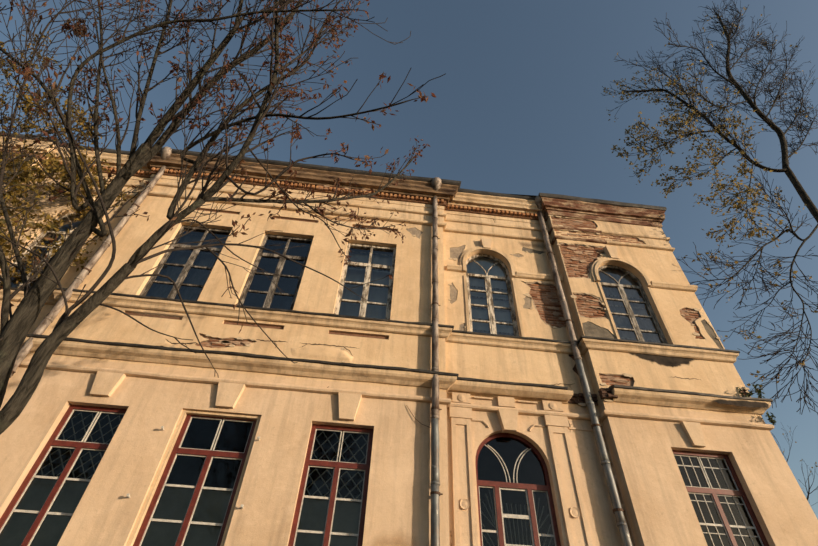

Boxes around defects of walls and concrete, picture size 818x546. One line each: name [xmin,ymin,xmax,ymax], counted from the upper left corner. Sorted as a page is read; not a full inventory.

flaking render [449,245,466,261]
flaking render [510,247,547,257]
flaking render [548,215,646,279]
flaking render [448,283,458,304]
flaking render [521,281,567,329]
flaking render [570,293,609,319]
flaking render [679,308,709,339]
flaking render [195,333,256,348]
crack [256,339,359,356]
flaking render [599,373,635,386]
leakage [714,399,769,408]